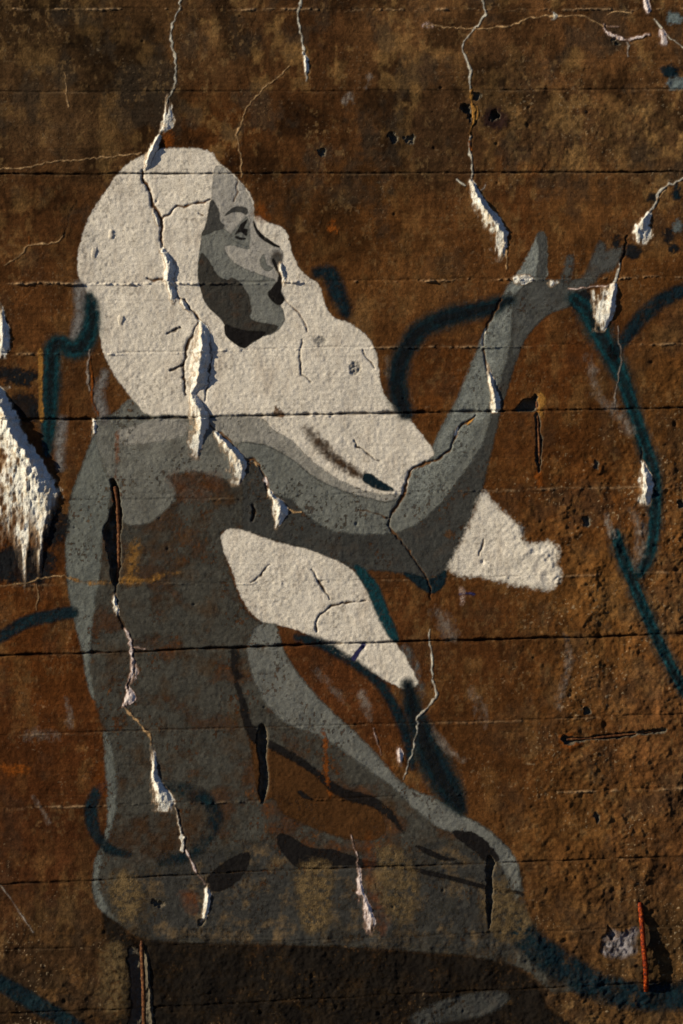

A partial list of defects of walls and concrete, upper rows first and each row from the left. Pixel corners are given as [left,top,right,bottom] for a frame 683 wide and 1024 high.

crack [92,0,309,244]
crack [425,0,584,179]
crack [649,178,683,212]
crack [361,419,473,599]
crack [111,594,151,740]
crack [405,630,438,774]
crack [351,835,376,932]